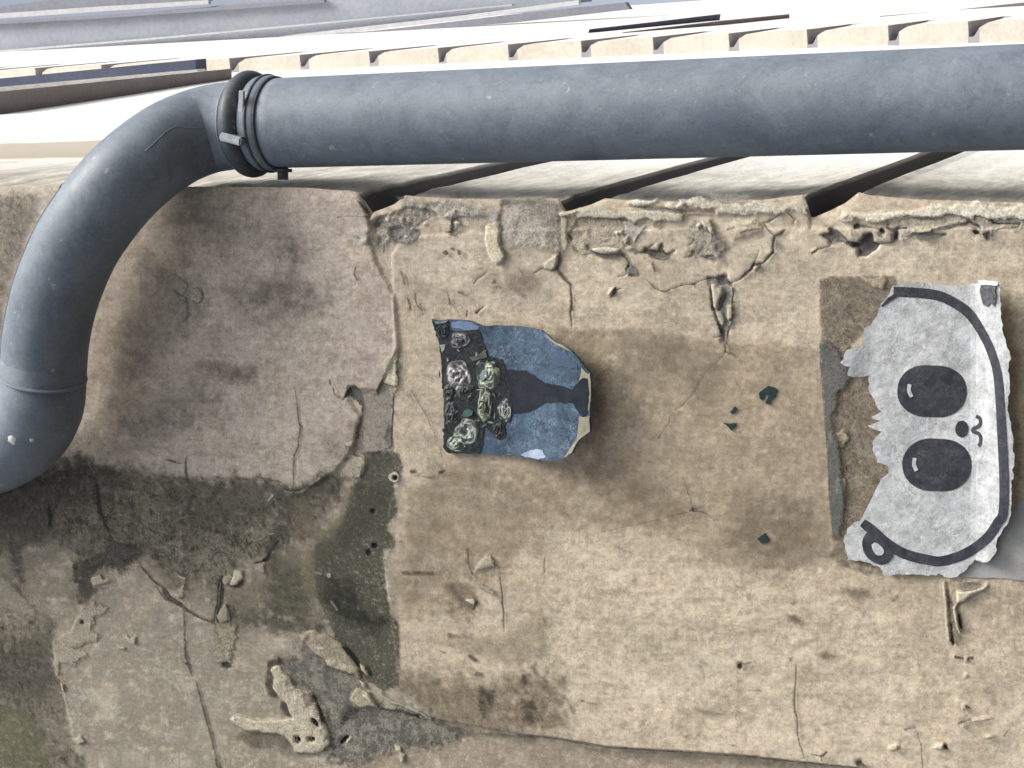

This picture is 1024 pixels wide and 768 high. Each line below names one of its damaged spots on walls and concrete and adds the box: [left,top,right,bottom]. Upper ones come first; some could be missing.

crack [344,196,371,219]
crack [533,217,573,326]
spalling [369,189,809,272]
crack [618,213,795,293]
flaking render [810,200,1024,256]
flaking render [329,378,398,453]
water stain [216,556,324,632]
water stain [328,582,387,632]
crack [141,566,221,768]
spalling [265,638,467,768]
spalling [241,731,291,752]